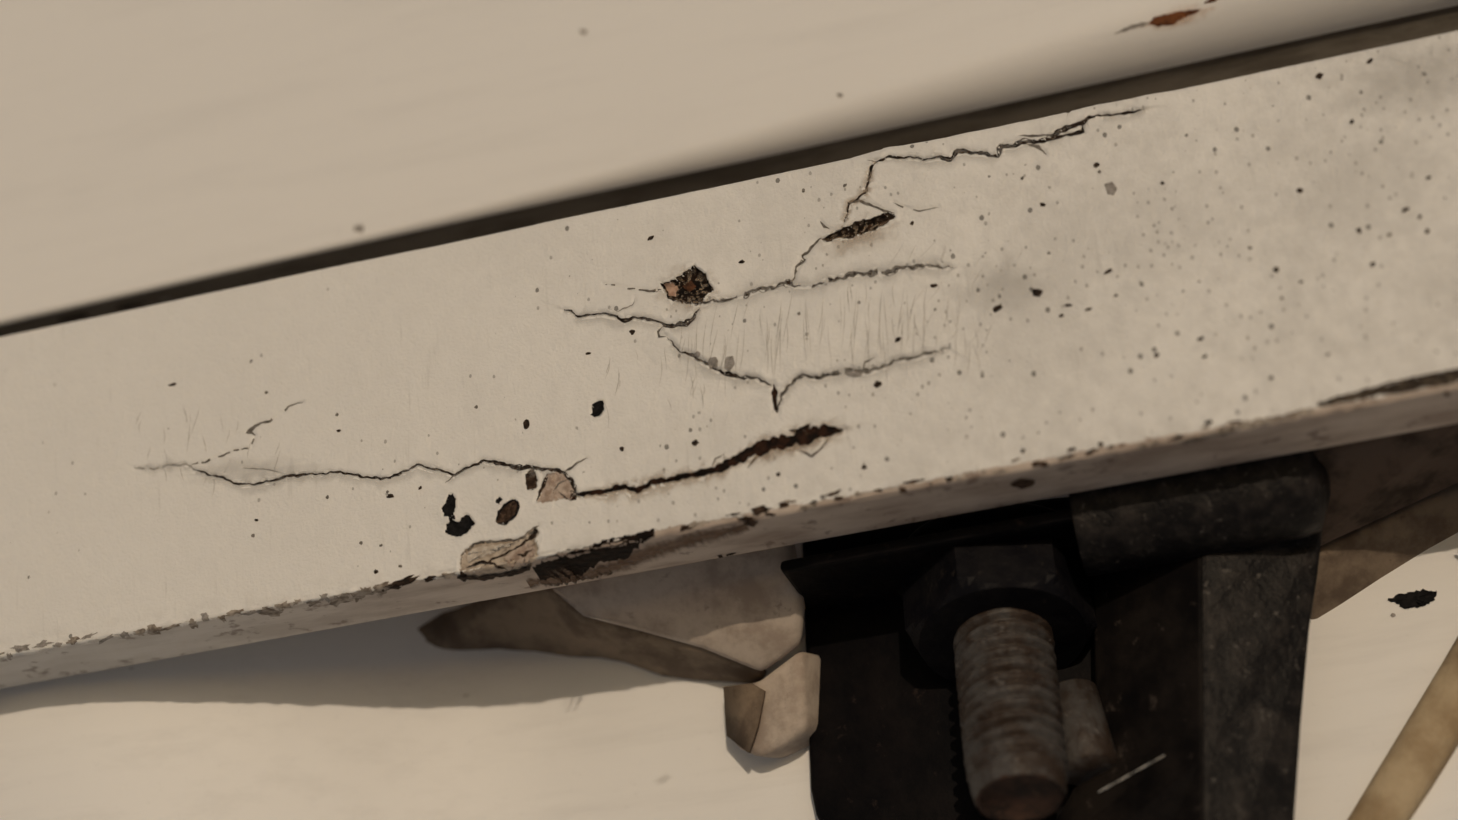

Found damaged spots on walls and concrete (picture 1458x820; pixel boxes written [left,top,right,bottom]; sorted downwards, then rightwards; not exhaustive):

rust [1114,0,1217,34]
crack [844,109,1141,222]
hole [605,265,714,306]
crack [134,257,952,496]
peeling [981,368,1458,489]
peeling [0,469,953,660]